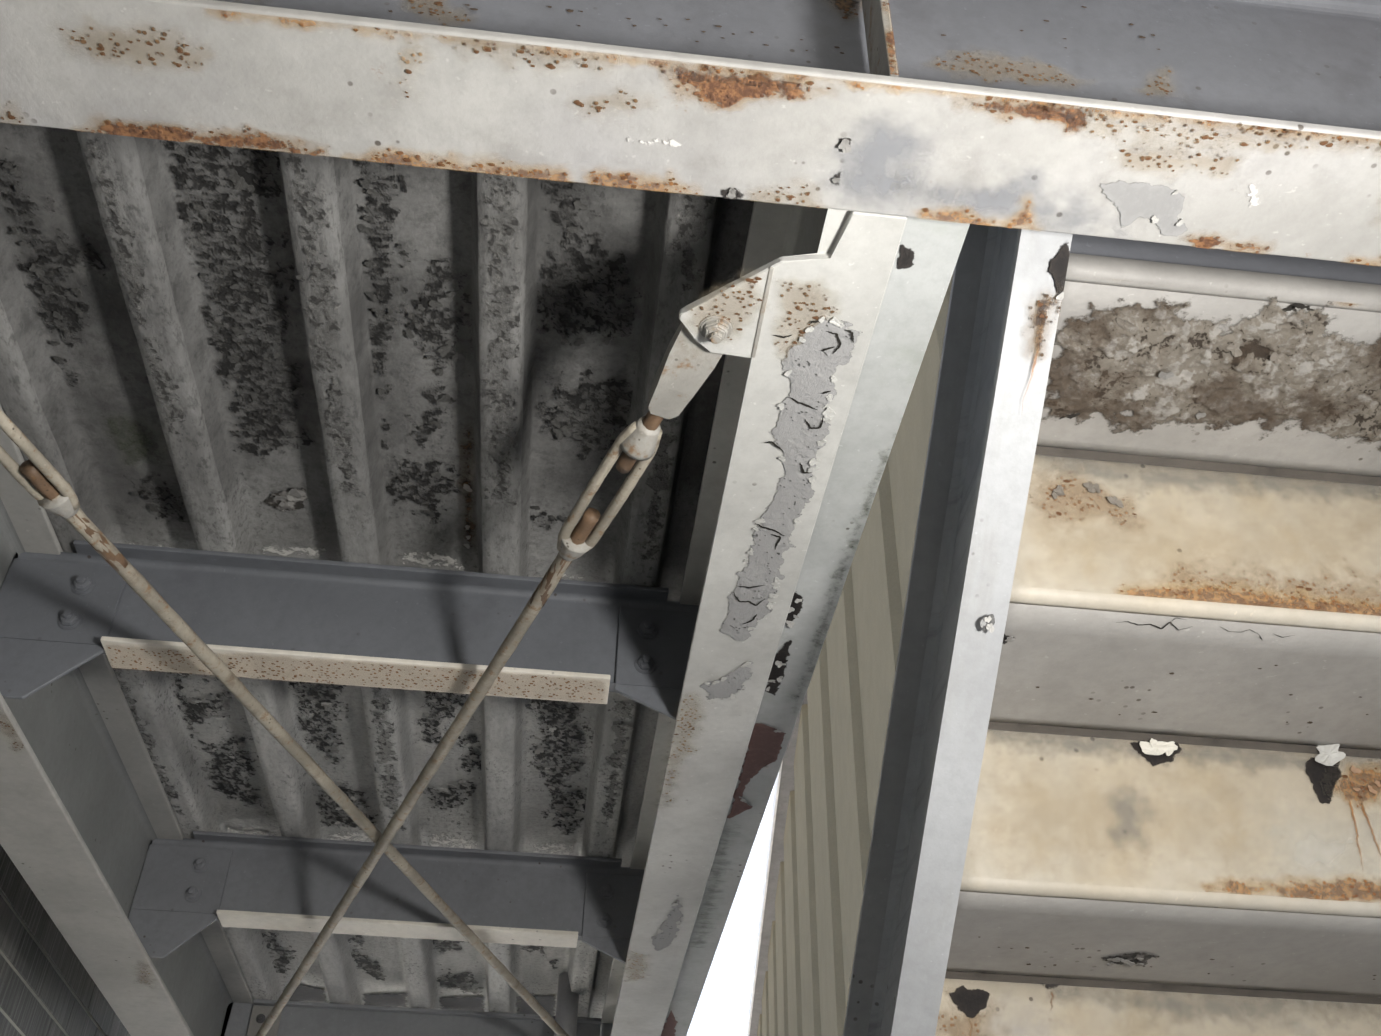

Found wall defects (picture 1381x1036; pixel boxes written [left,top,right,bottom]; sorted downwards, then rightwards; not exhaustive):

corrosion [649,60,864,109]
corrosion [81,119,324,156]
corrosion [936,52,1381,175]
spalling [1043,297,1381,450]
peeling [720,316,863,641]
corrosion [1118,565,1381,616]
peeling [727,723,786,819]
peeling [1139,738,1178,756]
peeling [1315,744,1346,766]
damp [329,831,373,842]
damp [428,833,477,849]
corrosion [1205,875,1381,901]